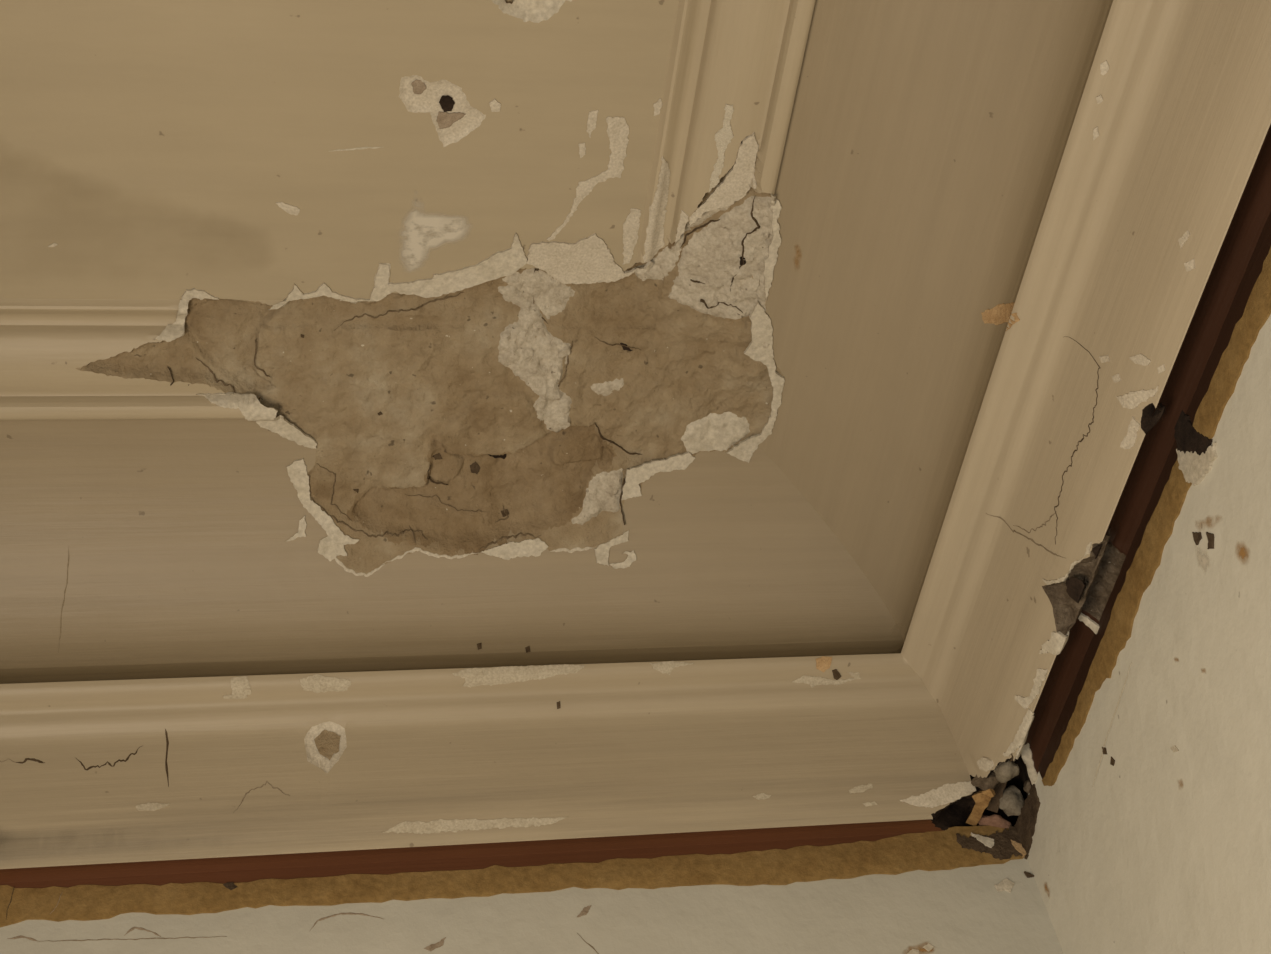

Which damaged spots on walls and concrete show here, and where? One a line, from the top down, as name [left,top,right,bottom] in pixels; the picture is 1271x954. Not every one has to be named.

flaking render [492,0,572,23]
flaking render [399,75,501,147]
flaking render [76,104,785,577]
crack [986,337,1100,558]
peeling [0,247,1271,927]
crack [0,757,45,765]
crack [76,729,169,787]